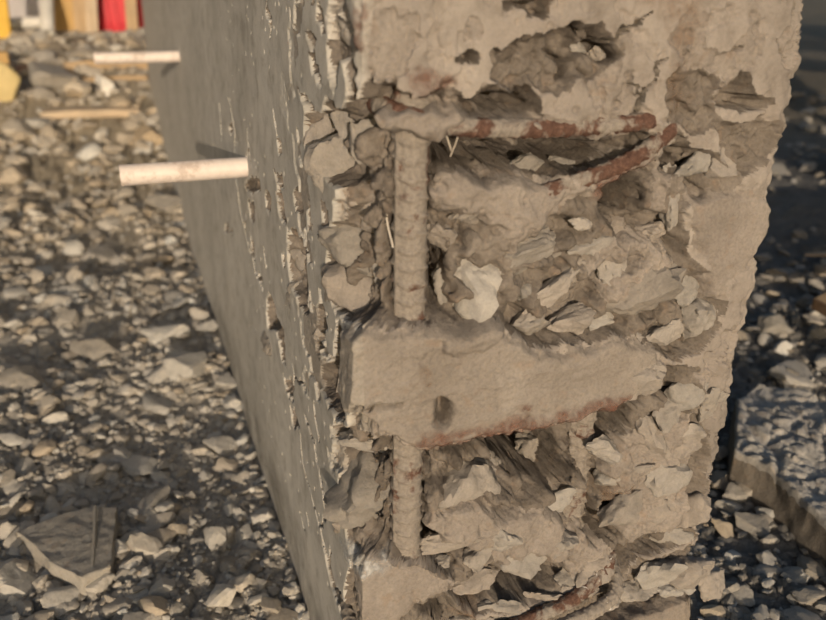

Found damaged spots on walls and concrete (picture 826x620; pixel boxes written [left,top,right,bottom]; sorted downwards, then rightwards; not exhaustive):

peeling [293,0,359,87]
peeling [668,10,766,96]
peeling [776,11,802,69]
peeling [297,139,313,263]
peeling [366,8,678,321]
peeling [682,187,771,301]
peeling [303,293,338,401]
peeling [332,444,350,471]
spalling [340,412,725,620]